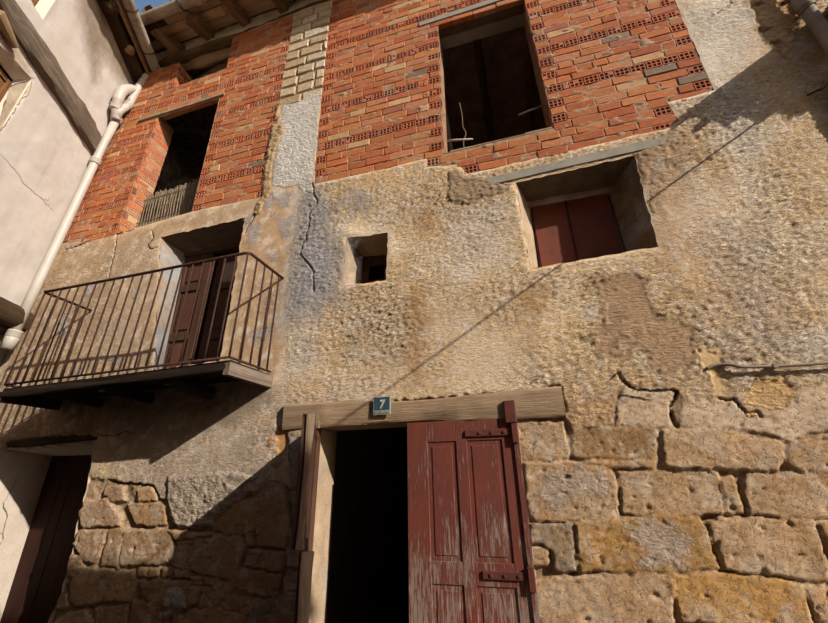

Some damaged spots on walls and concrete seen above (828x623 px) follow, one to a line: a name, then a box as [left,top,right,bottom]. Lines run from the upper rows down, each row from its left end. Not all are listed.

crack [609,373,678,422]
flaking render [740,377,797,417]
flaking render [268,427,289,470]